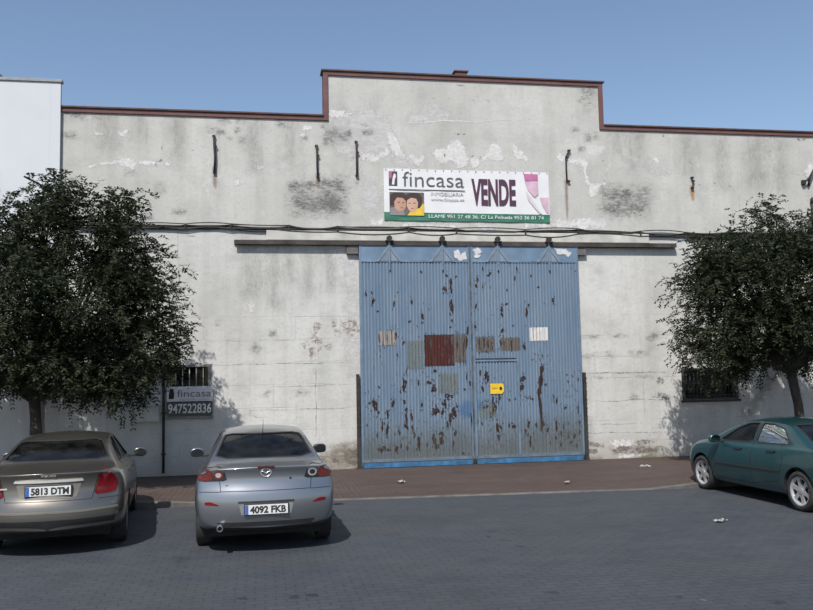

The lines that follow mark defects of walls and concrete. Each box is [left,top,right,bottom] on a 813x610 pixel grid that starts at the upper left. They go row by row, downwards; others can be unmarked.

peeling [328,109,532,226]
peeling [556,153,608,197]
corrosion [424,271,526,366]
peeling [368,369,464,456]
peeling [463,370,537,449]
corrosion [537,366,547,431]
peeling [589,433,659,459]